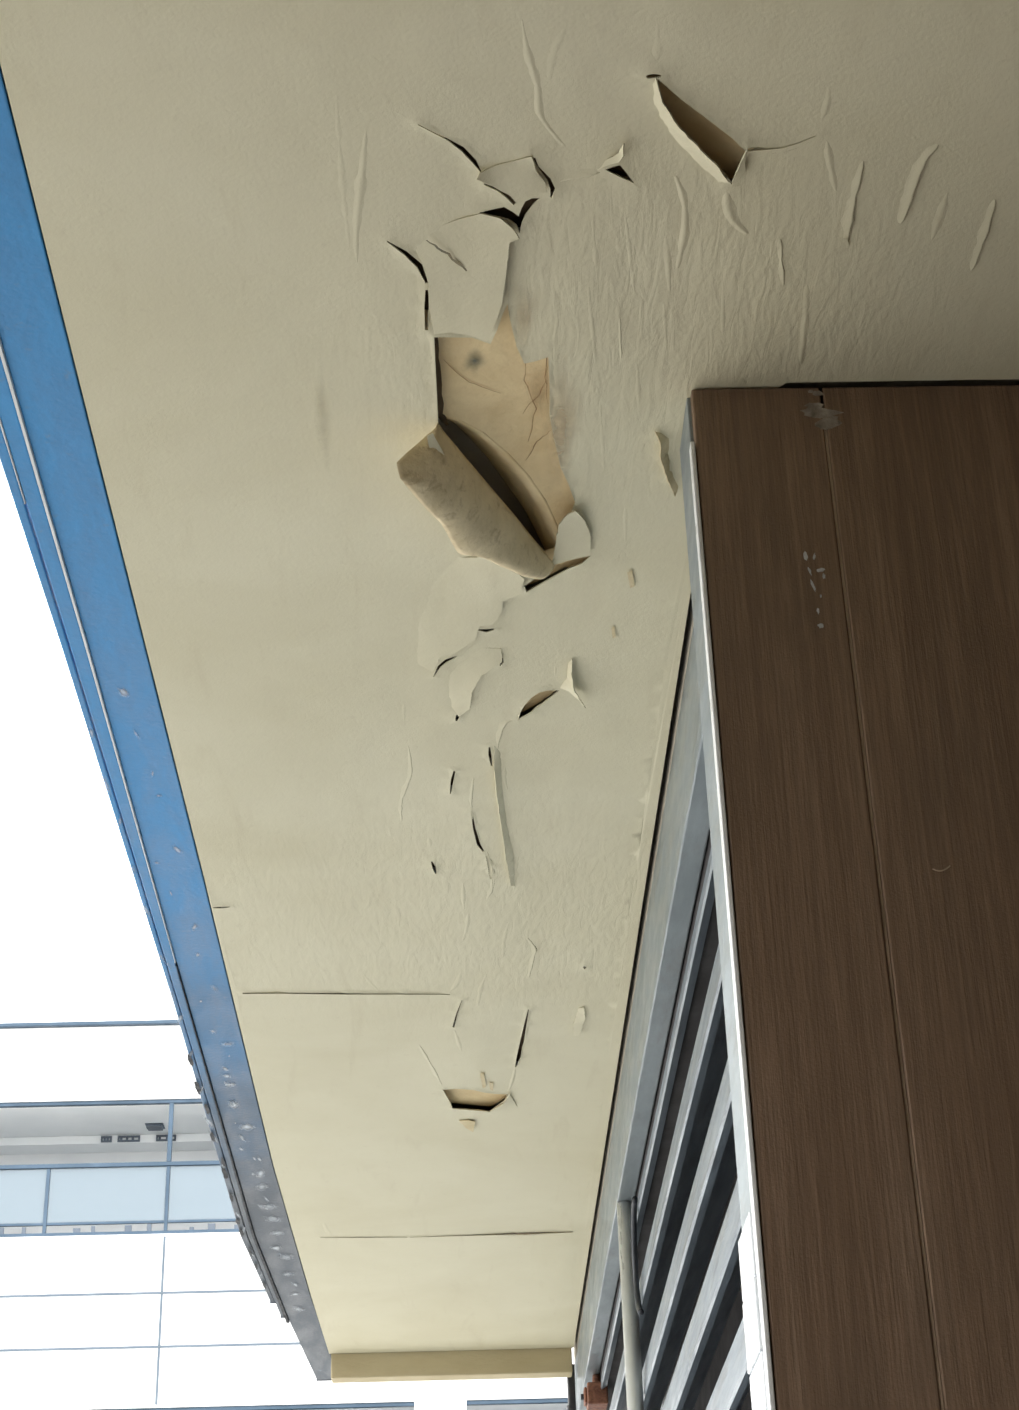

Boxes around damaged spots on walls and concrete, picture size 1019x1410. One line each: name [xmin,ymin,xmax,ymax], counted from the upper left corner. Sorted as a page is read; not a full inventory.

peeling [647,22,809,234]
peeling [388,213,591,673]
peeling [655,432,678,496]
peeling [496,659,586,750]
peeling [418,1044,517,1132]